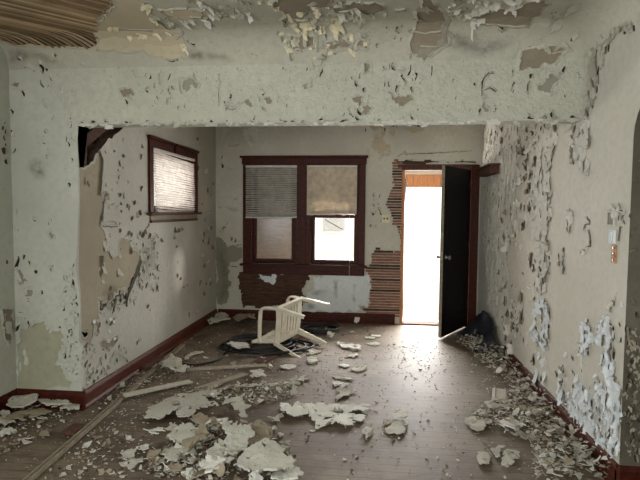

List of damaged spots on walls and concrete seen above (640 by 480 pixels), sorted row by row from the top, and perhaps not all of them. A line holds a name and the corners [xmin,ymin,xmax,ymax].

peeling [0,0,551,390]
peeling [557,248,565,275]
peeling [607,203,637,241]
peeling [550,292,640,463]